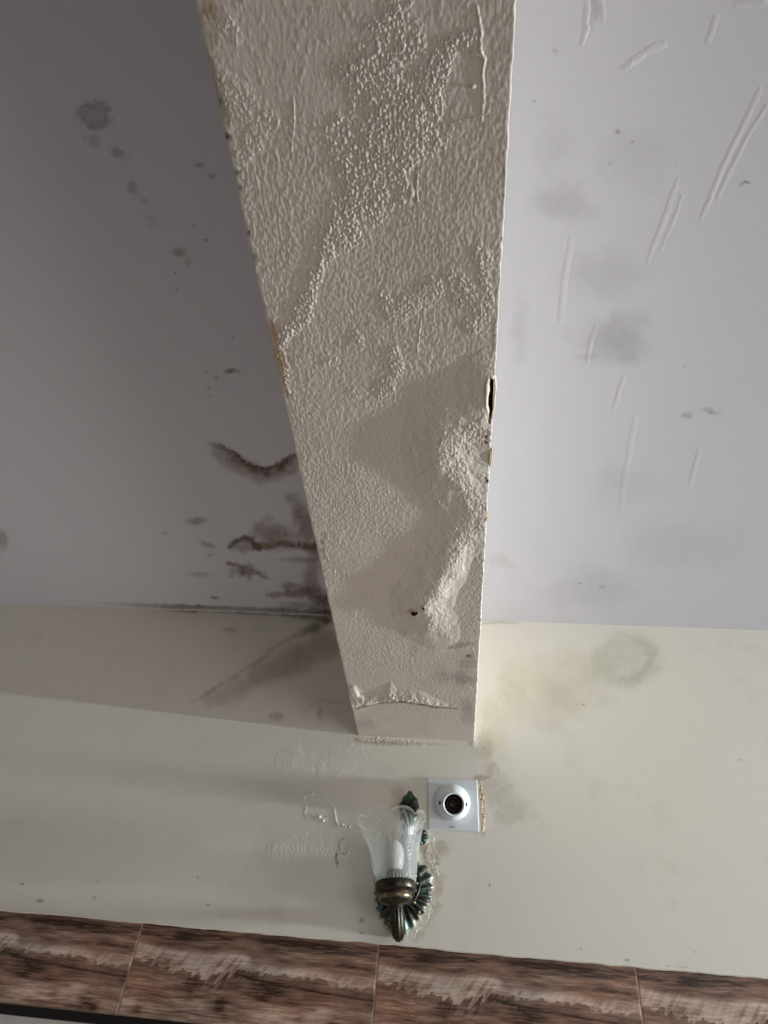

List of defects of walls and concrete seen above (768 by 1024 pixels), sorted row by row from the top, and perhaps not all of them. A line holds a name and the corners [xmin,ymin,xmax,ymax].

spalling [485,373,497,423]
water stain [220,445,296,473]
water stain [232,511,317,550]
water stain [478,776,486,833]